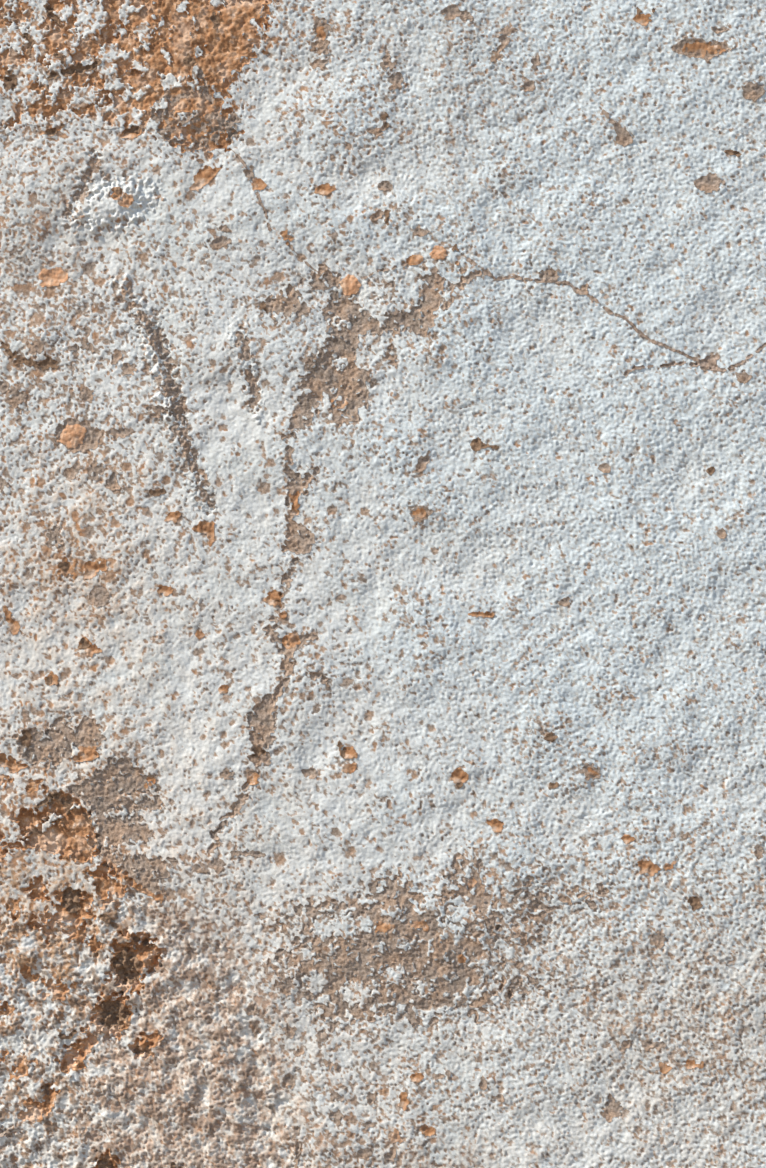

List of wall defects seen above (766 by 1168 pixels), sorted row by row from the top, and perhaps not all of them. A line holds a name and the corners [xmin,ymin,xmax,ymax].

spalling [0,0,273,191]
crack [235,154,313,270]
crack [362,262,406,279]
crack [467,258,766,377]
peeling [0,714,177,952]
spalling [20,965,78,1002]
spalling [111,936,154,985]
peeling [253,853,609,1043]
spalling [56,1028,77,1040]
spalling [100,1000,131,1029]
spalling [0,1051,38,1082]
spalling [17,1081,61,1124]